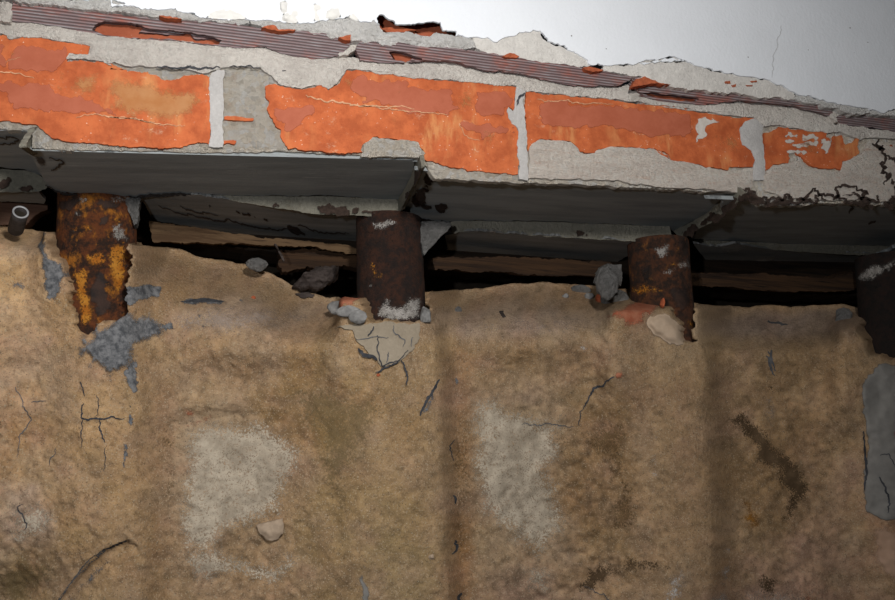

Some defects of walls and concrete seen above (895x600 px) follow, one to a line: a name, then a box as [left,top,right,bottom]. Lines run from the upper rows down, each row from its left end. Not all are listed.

flaking render [0,35,211,150]
peeling [0,0,895,119]
flaking render [265,70,860,176]
peeling [78,284,173,393]
crack [80,382,124,469]
leakage [167,410,300,583]
leakage [455,398,565,593]